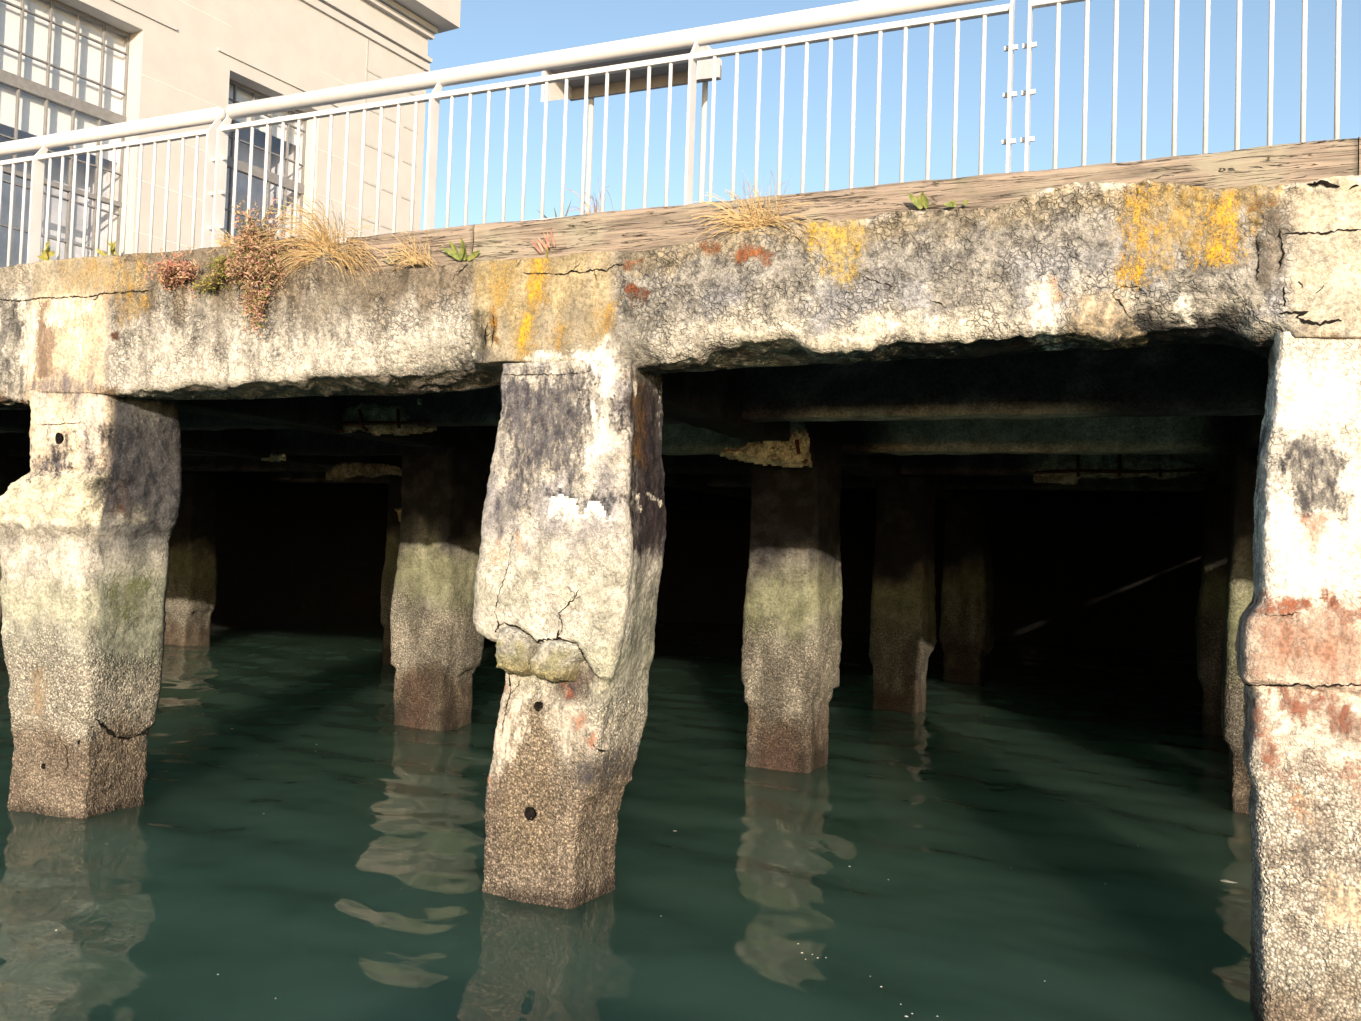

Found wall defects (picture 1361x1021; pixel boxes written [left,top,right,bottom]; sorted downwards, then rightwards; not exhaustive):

crack [1256,228,1361,326]
water stain [28,305,673,557]
spalling [720,422,812,467]
water stain [1252,350,1353,593]
crack [494,533,585,658]
corrosion [1235,589,1361,739]
crack [96,719,151,740]
corrosion [1243,696,1288,782]